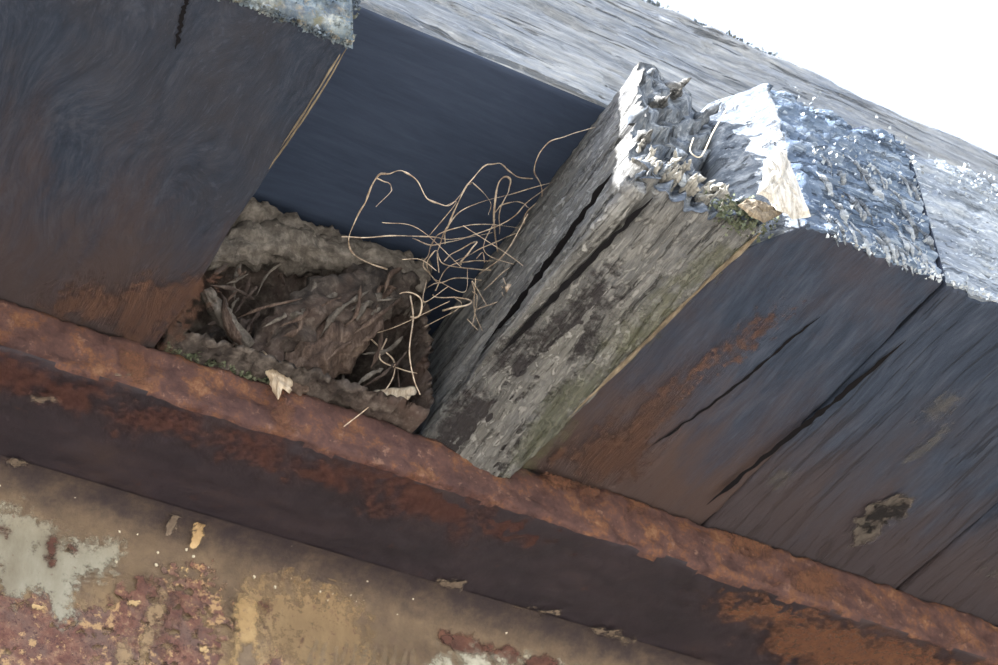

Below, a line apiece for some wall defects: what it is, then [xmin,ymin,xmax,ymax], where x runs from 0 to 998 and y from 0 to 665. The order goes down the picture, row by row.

crack [175,0,189,49]
crack [483,173,653,354]
crack [653,317,820,445]
crack [707,340,906,505]
rust [44,536,78,567]
peeling [0,501,127,630]
peeling [165,514,181,536]
peeling [190,522,205,549]
rust [0,559,236,665]
rust [438,628,558,665]
rust [703,581,968,665]